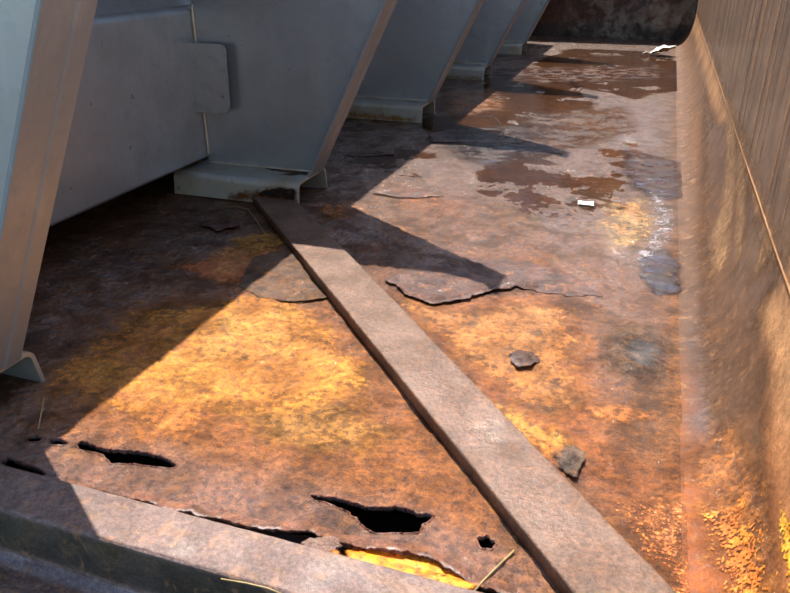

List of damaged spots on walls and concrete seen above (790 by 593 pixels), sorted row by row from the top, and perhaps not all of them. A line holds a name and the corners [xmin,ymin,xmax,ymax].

damp [440,89,502,116]
damp [448,106,636,164]
damp [495,66,663,83]
corrosion [174,233,285,284]
damp [599,149,683,295]
damp [686,0,790,583]
corrosion [46,297,386,449]
corrosion [400,300,652,478]
peeling [129,490,524,593]
corrosion [331,547,475,588]
corrosion [614,430,790,593]